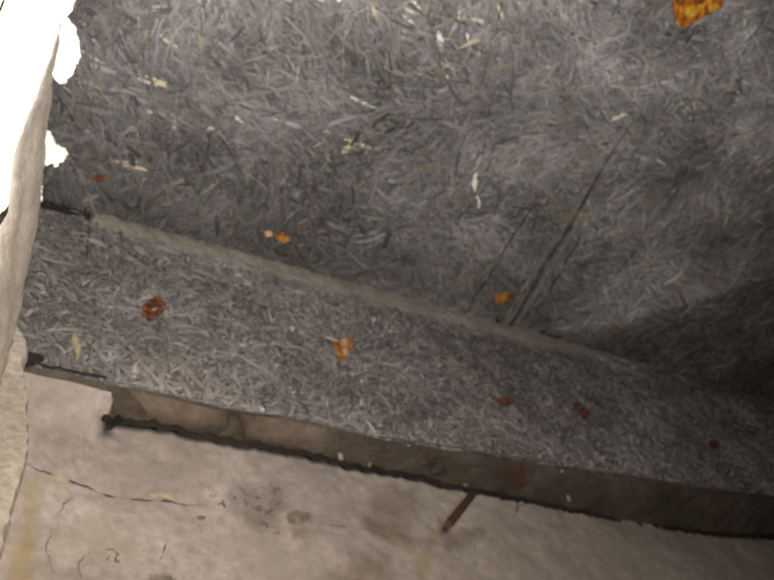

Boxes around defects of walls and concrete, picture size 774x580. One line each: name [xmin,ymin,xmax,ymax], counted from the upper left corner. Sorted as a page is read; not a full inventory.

corrosion [673,0,723,27]
corrosion [141,296,166,321]
corrosion [494,292,513,305]
corrosion [332,337,354,361]
crack [26,463,204,566]